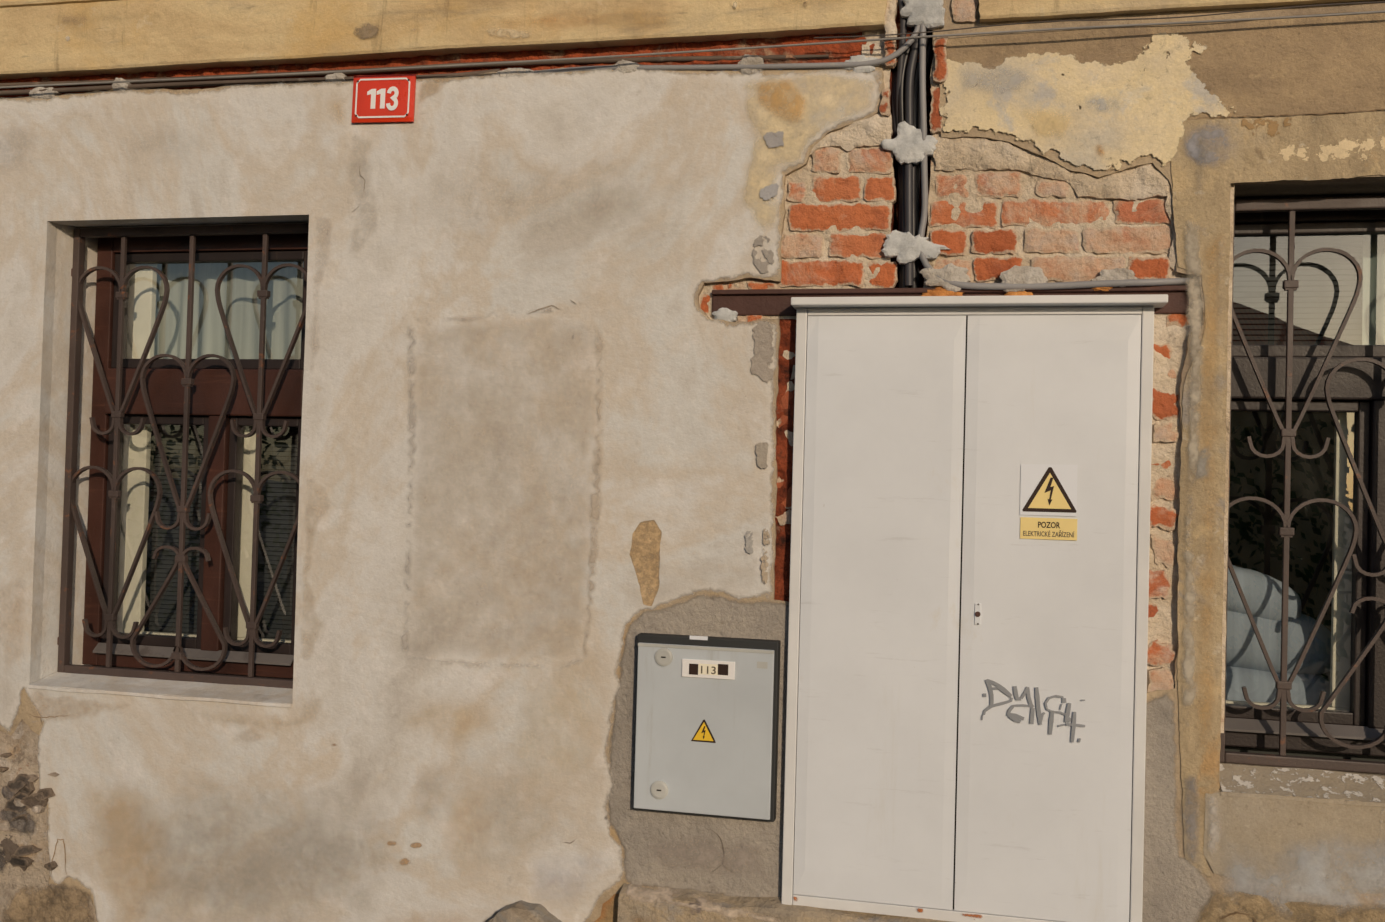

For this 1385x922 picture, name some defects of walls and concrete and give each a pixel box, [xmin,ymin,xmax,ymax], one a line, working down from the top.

spalling [699,0,906,320]
spalling [736,315,796,602]
spalling [919,0,1236,733]
spalling [630,521,662,606]
spalling [0,720,66,922]
spalling [76,896,97,922]
peeling [1220,764,1385,802]